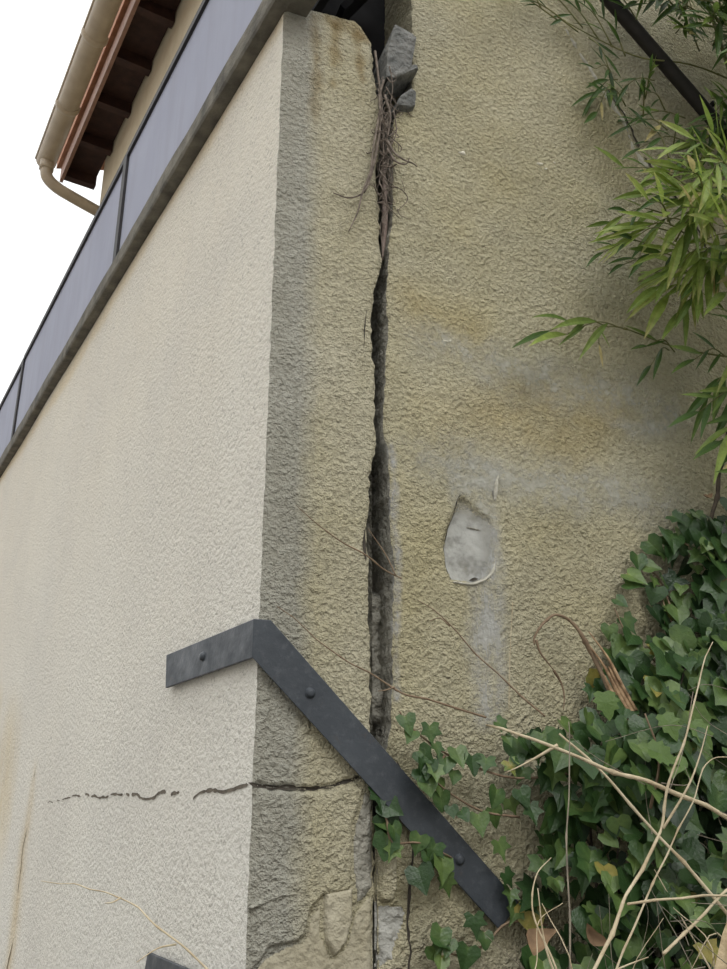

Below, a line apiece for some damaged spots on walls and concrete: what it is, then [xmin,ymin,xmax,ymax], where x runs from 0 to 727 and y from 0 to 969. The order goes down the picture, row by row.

crack [361,527,369,560]
flaking render [444,470,500,587]
crack [369,592,383,730]
crack [49,777,358,803]
crack [406,849,414,969]